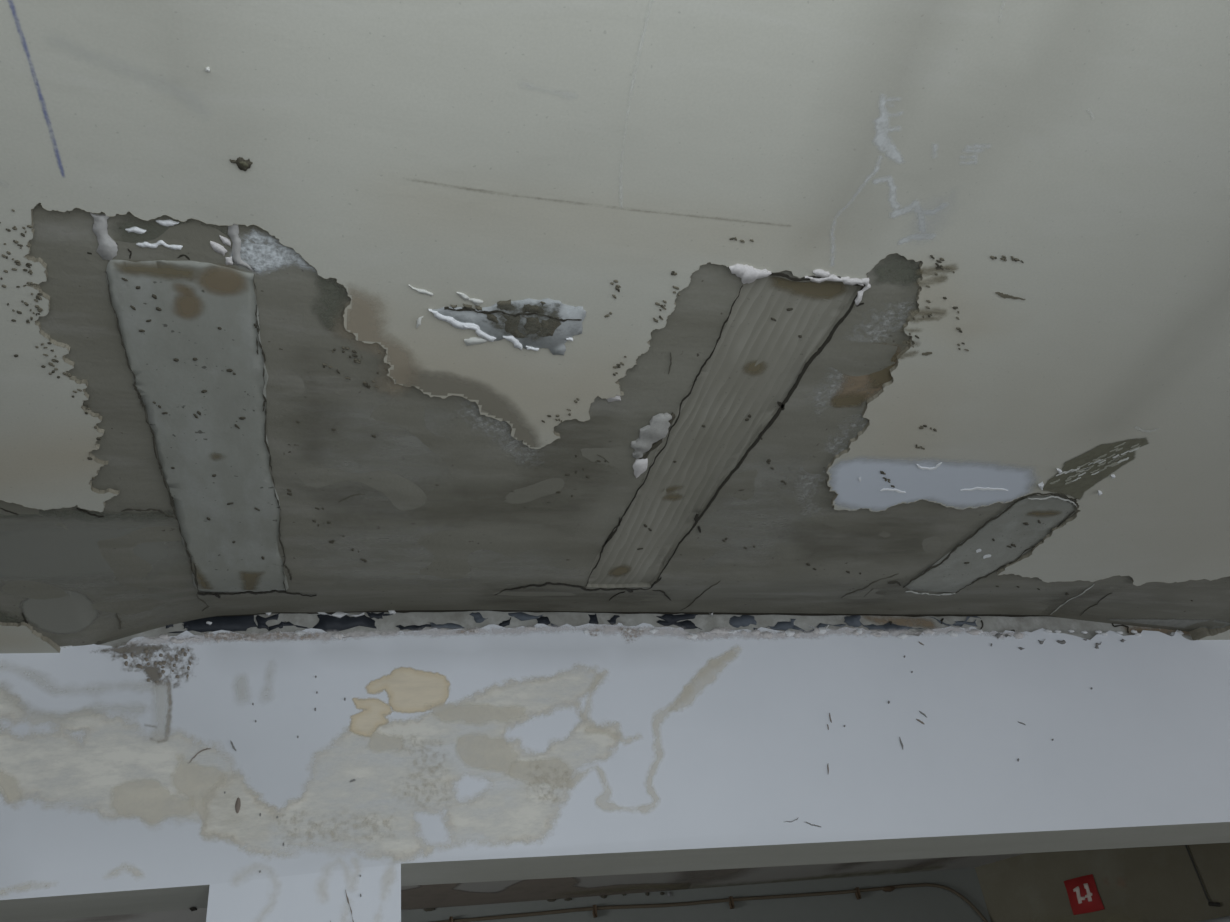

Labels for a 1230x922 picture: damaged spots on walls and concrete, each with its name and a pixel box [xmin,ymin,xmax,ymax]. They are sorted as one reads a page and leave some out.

crack [77,243,1079,632]
flaking render [0,203,1230,653]
leakage [0,645,621,860]